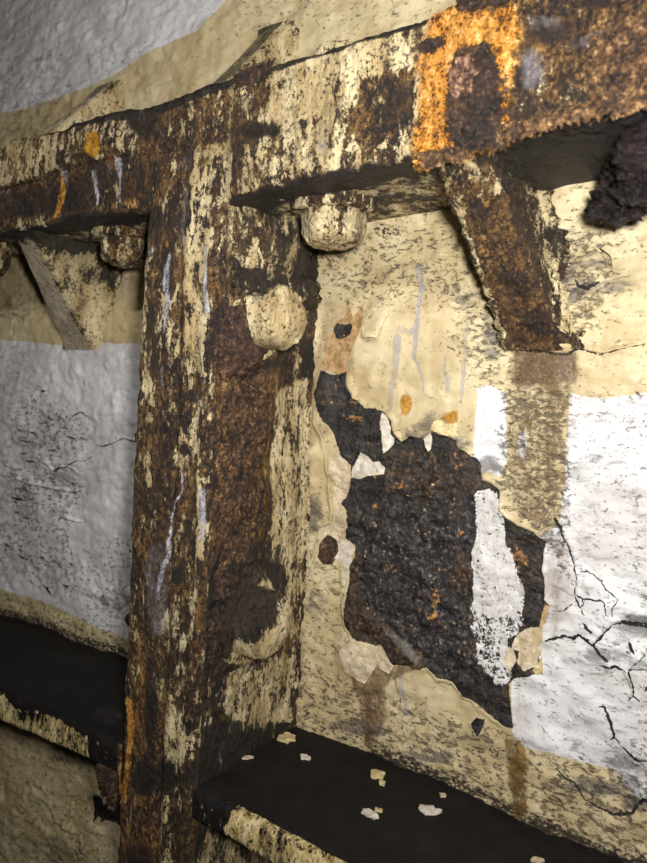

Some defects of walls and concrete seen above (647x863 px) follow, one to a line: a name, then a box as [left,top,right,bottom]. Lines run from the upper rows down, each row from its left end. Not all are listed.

rust [409,0,647,175]
crack [97,433,136,447]
rust [207,352,279,688]
peeling [306,264,557,737]
crack [545,517,647,702]
crack [599,705,647,762]
peeling [91,789,121,827]
peeling [361,807,383,820]
crack [556,768,647,817]